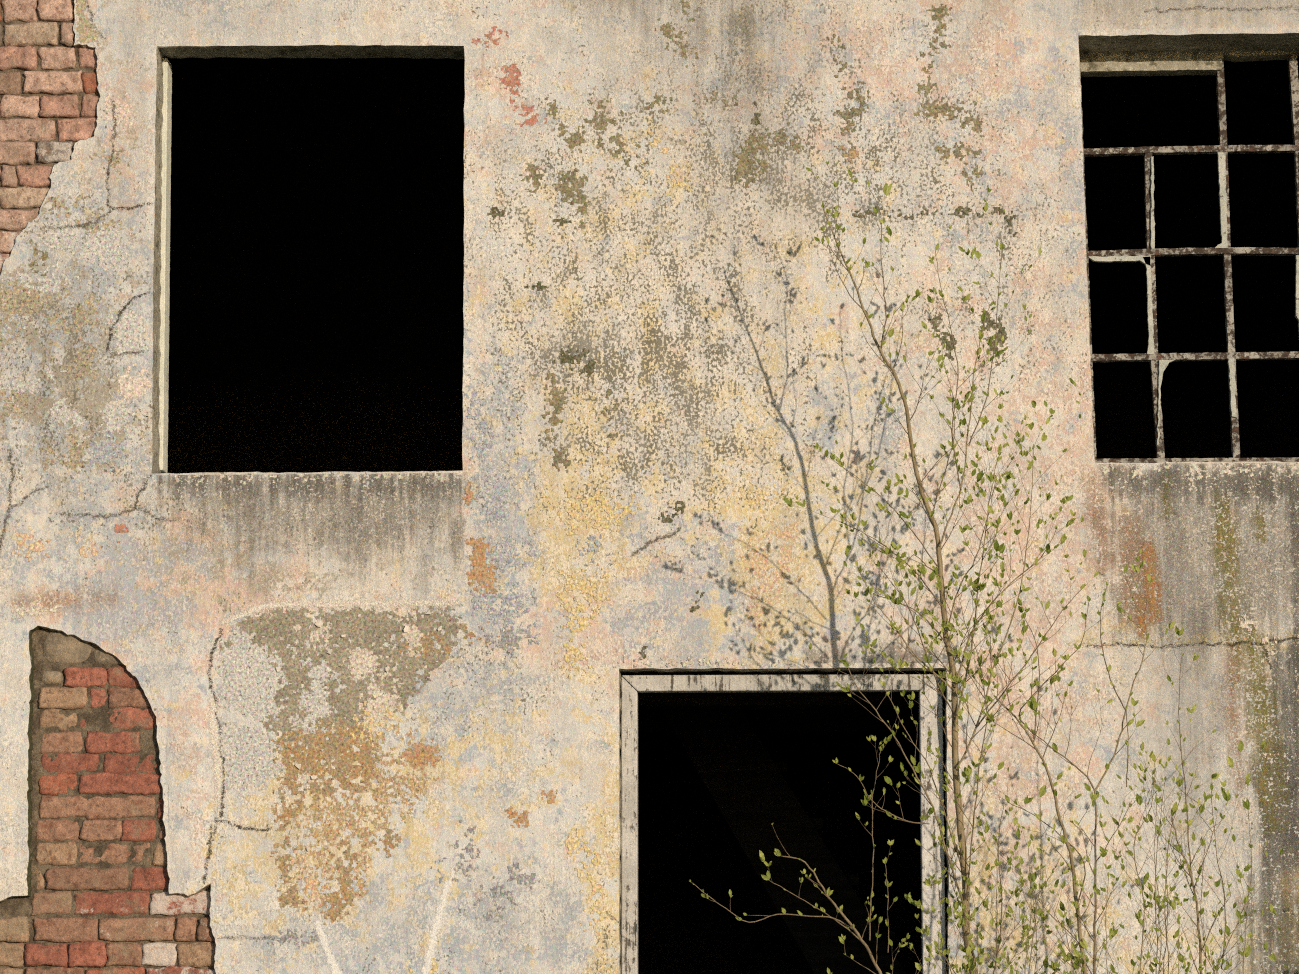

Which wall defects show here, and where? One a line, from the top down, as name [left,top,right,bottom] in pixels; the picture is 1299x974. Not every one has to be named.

crack [41,101,150,230]
flaking render [0,0,152,476]
crack [106,291,148,356]
peeling [539,345,596,471]
crack [0,446,178,551]
water stain [175,472,462,541]
peeling [716,472,804,638]
peeling [207,389,686,925]
flaking render [614,646,845,667]
water stain [1067,463,1299,974]
crack [1087,614,1299,669]
flaking render [0,598,216,974]